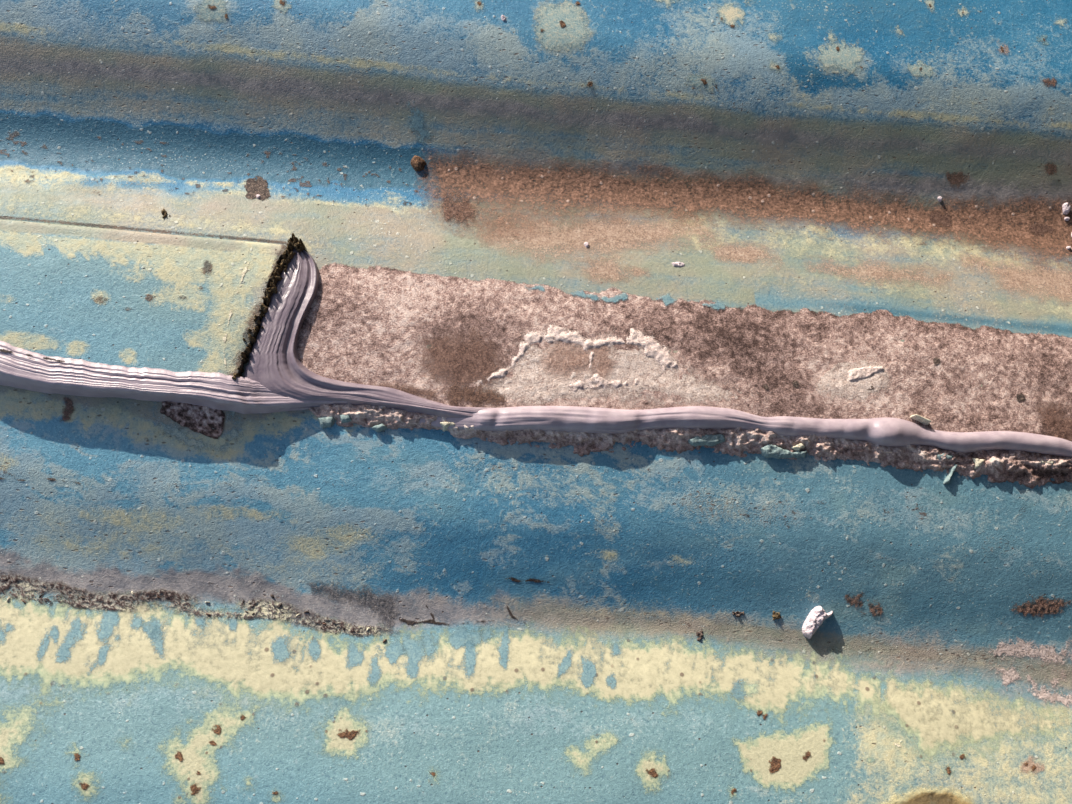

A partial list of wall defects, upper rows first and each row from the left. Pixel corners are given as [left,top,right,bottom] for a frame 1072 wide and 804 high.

rust [425,156,1072,301]
crack [223,263,249,367]
spalling [297,262,1072,489]
peeling [0,571,400,643]
rust [1010,596,1072,617]
peeling [0,698,64,773]
peeling [322,707,371,760]